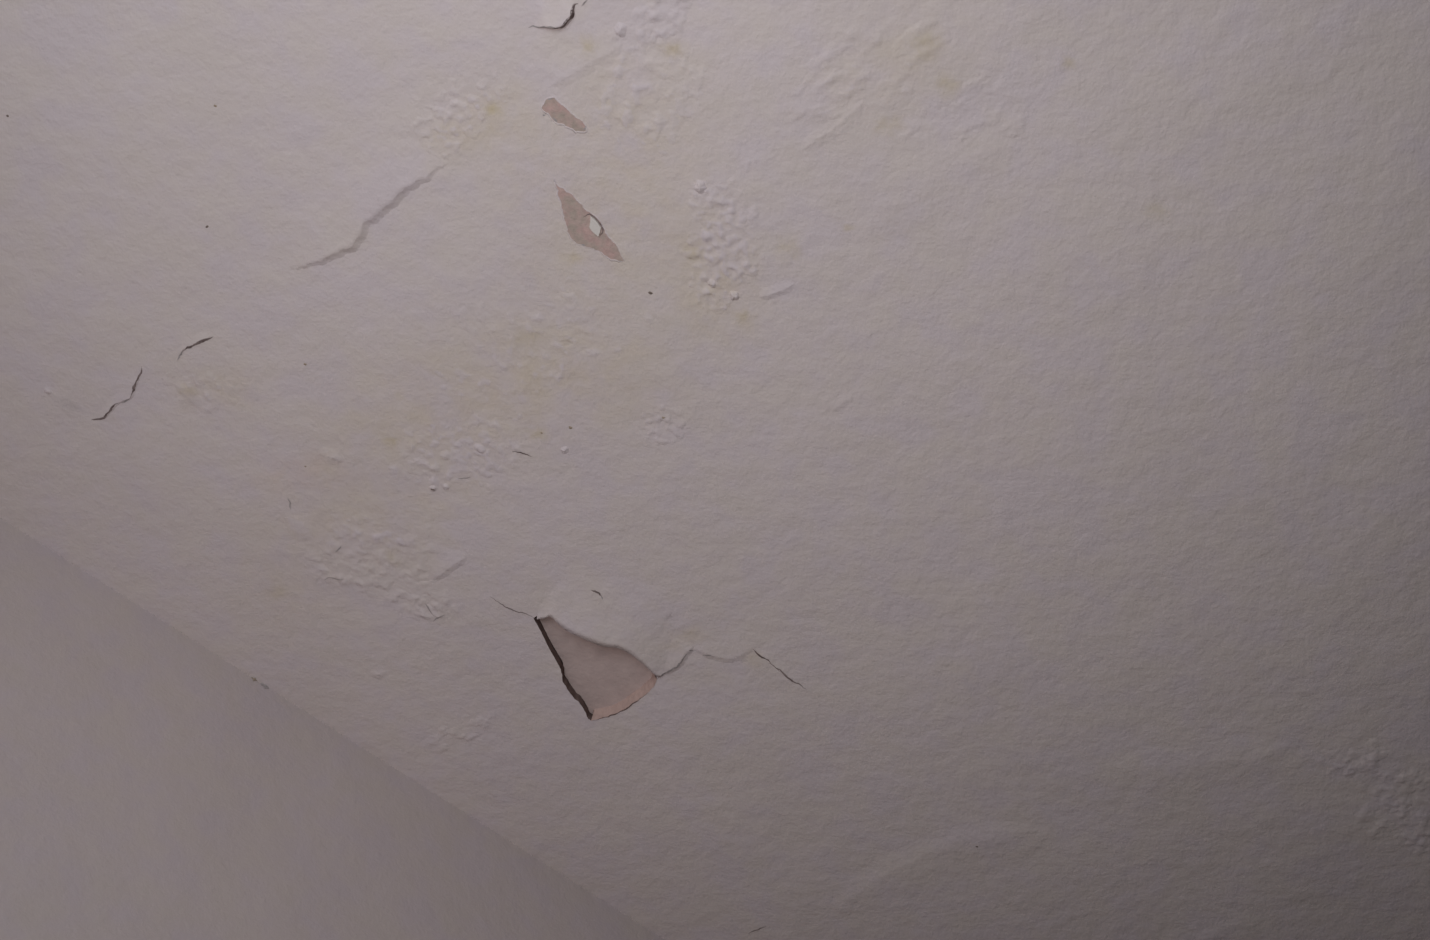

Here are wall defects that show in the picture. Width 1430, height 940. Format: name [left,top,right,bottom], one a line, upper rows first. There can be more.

peeling [540,96,588,134]
peeling [554,178,625,263]
crack [176,332,213,359]
crack [92,367,142,420]
flaking render [540,617,657,720]
crack [657,650,711,679]
crack [753,649,807,690]